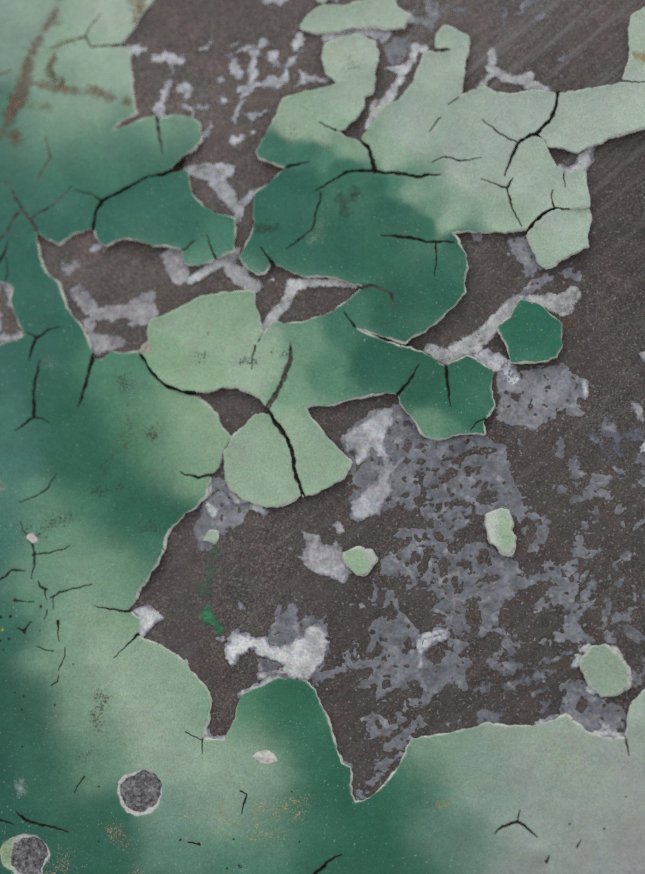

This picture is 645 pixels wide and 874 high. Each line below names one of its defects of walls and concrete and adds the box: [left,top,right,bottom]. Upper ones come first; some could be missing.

rust [0,8,76,142]
crack [0,118,187,281]
peeling [36,229,244,328]
crack [260,91,569,265]
crack [381,234,454,277]
crack [140,354,195,395]
crack [265,342,305,496]
peeling [93,0,645,800]
crack [0,473,130,686]
spalling [0,834,49,874]
spalling [117,769,162,816]
crack [494,810,537,837]